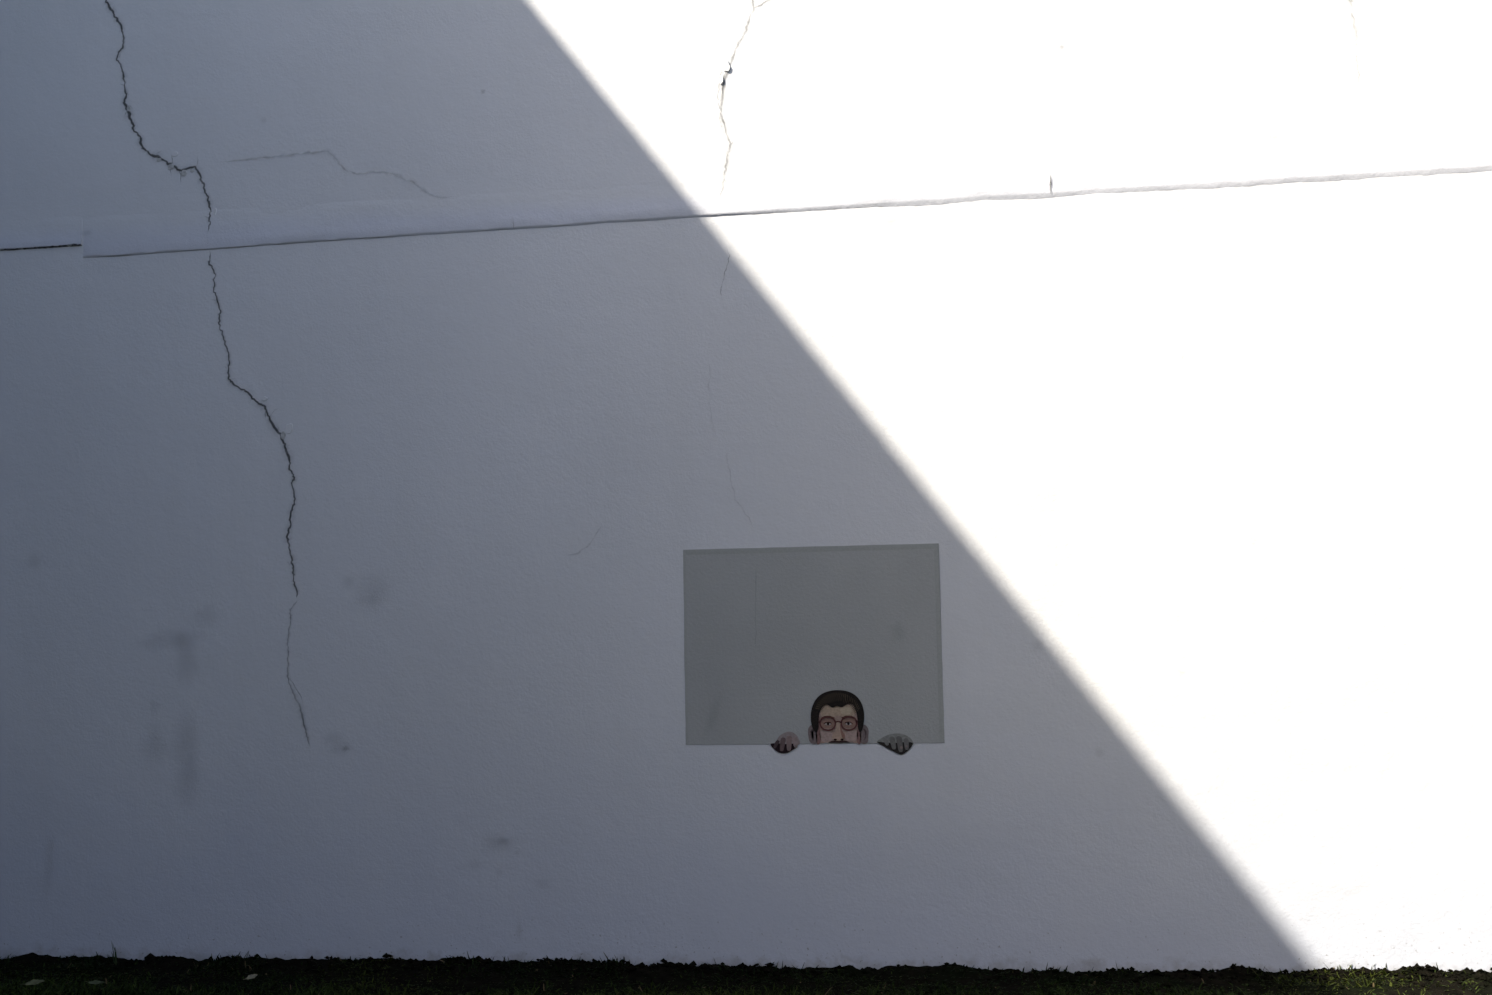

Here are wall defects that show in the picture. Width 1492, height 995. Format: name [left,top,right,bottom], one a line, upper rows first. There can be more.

crack [105,0,298,597]
crack [718,60,733,145]